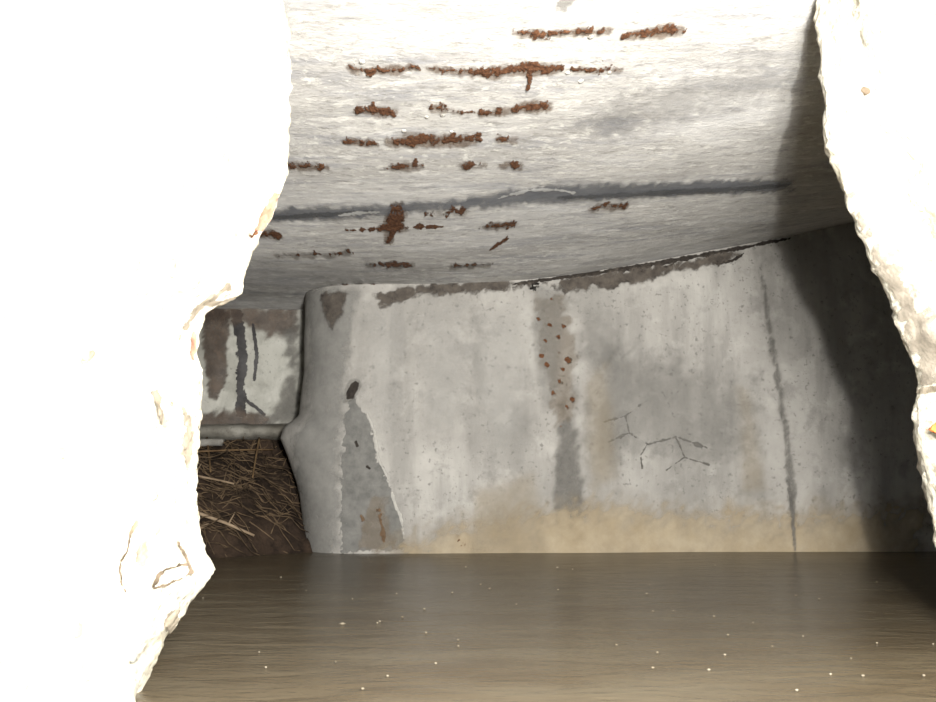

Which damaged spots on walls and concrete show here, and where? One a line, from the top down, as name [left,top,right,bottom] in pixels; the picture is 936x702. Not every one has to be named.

rust [517,26,611,40]
rust [621,19,687,40]
rust [348,57,623,119]
rust [343,129,483,147]
rust [287,161,329,171]
rust [386,158,424,171]
rust [345,203,466,244]
rust [479,220,517,251]
rust [370,261,412,269]
damp [200,288,356,553]
crack [604,404,710,471]
damp [399,368,924,554]